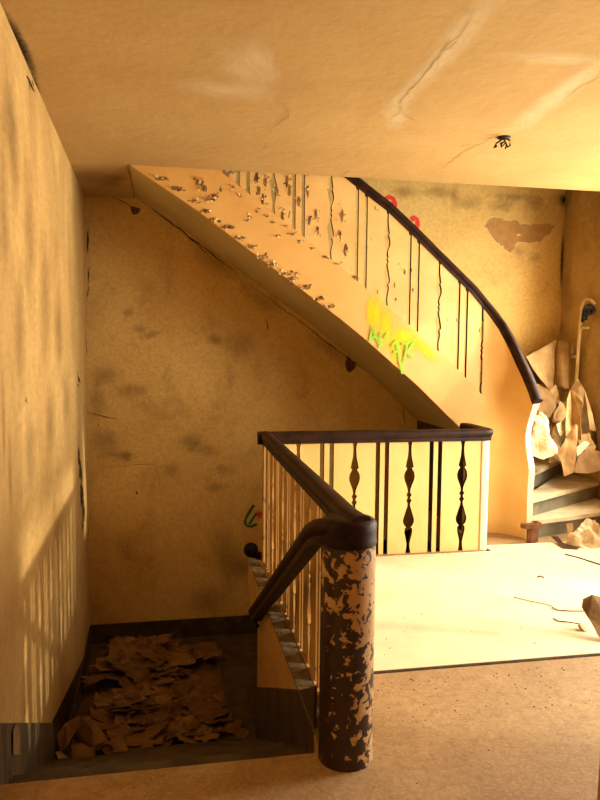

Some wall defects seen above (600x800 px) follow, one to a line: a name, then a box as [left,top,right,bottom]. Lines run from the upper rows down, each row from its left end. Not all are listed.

peeling [155,172,335,309]
peeling [322,208,348,265]
peeling [484,218,555,254]